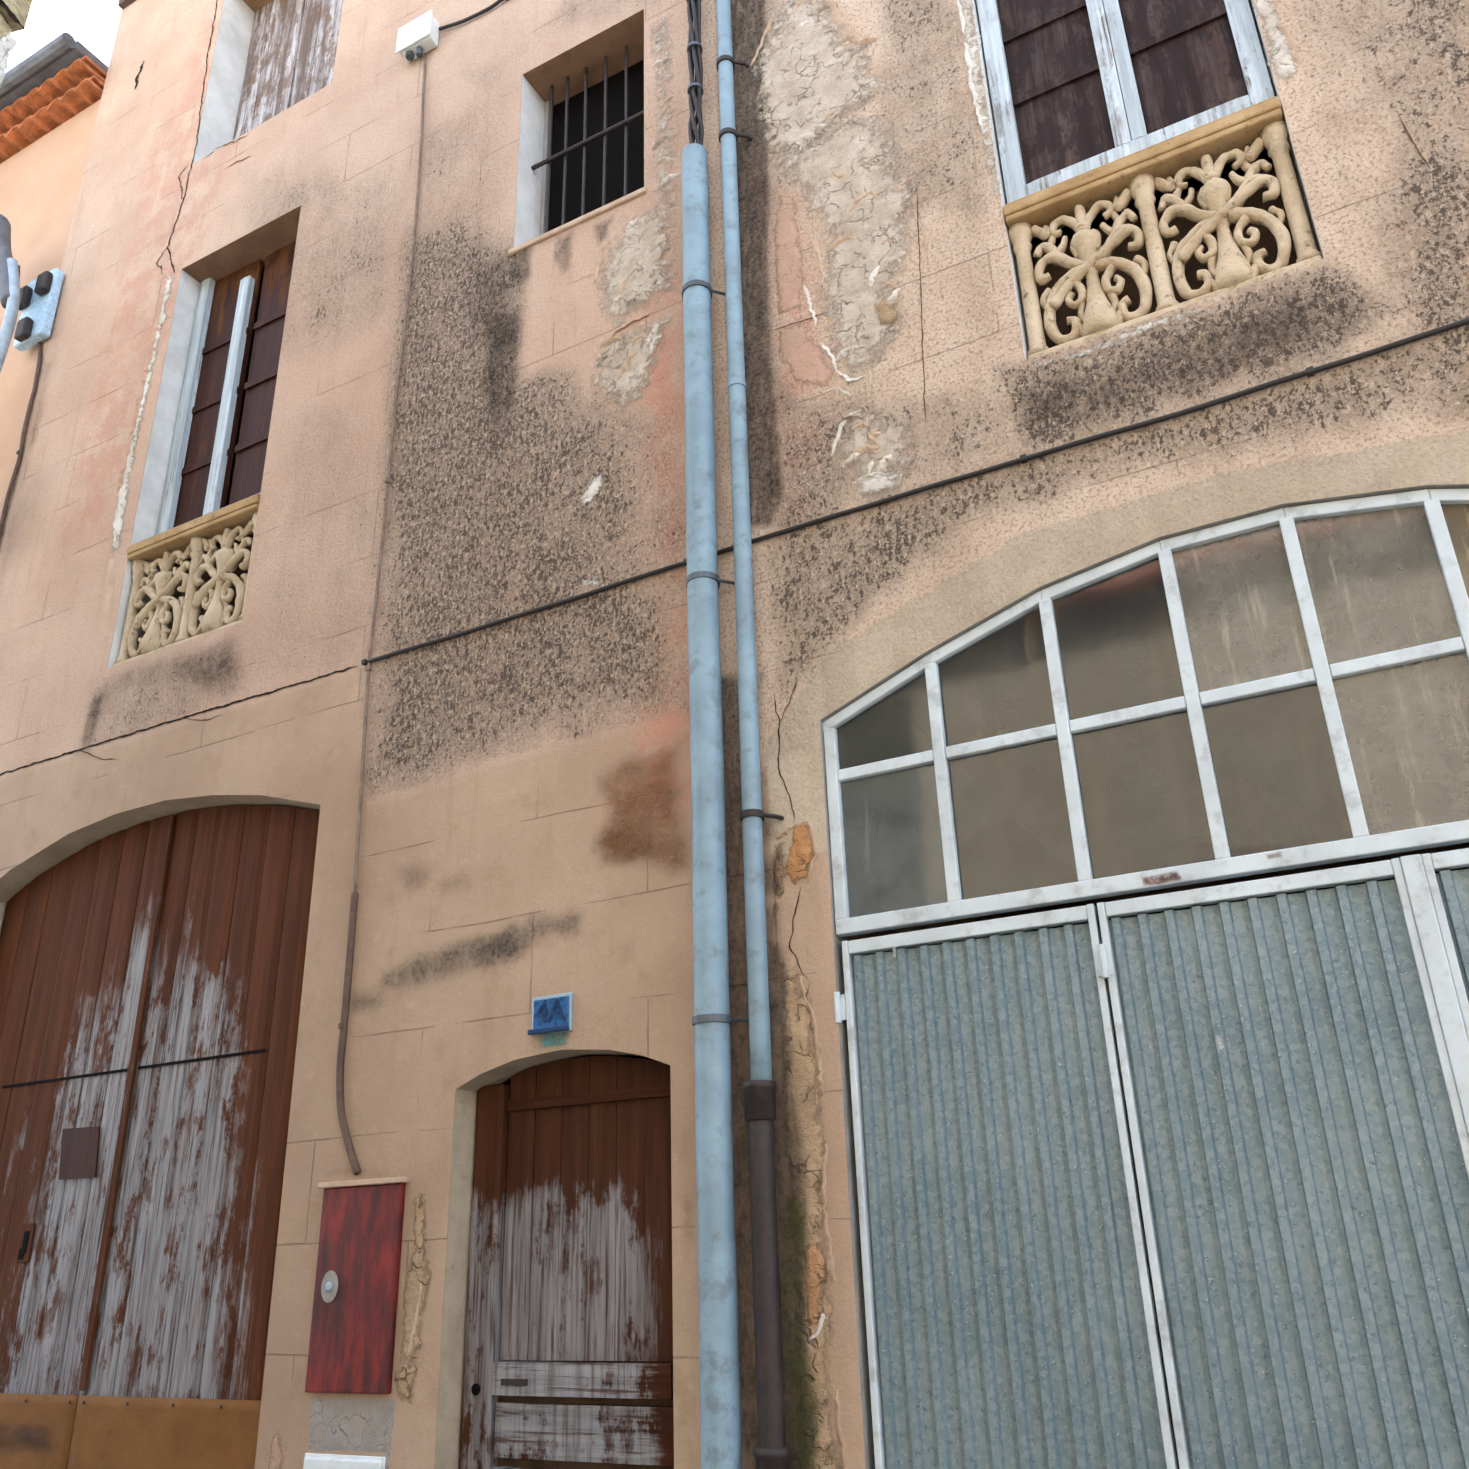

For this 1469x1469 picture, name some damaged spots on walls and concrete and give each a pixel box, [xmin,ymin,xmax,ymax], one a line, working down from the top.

flaking render [0,32,19,86]
crack [156,1,250,274]
flaking render [590,18,680,413]
flaking render [750,0,916,495]
flaking render [1255,0,1299,78]
flaking render [112,275,173,552]
damp [600,761,681,863]
crack [774,672,798,819]
flaking render [773,820,818,909]
crack [789,892,813,1032]
flaking render [395,1194,431,1404]
flaking render [781,962,848,1469]